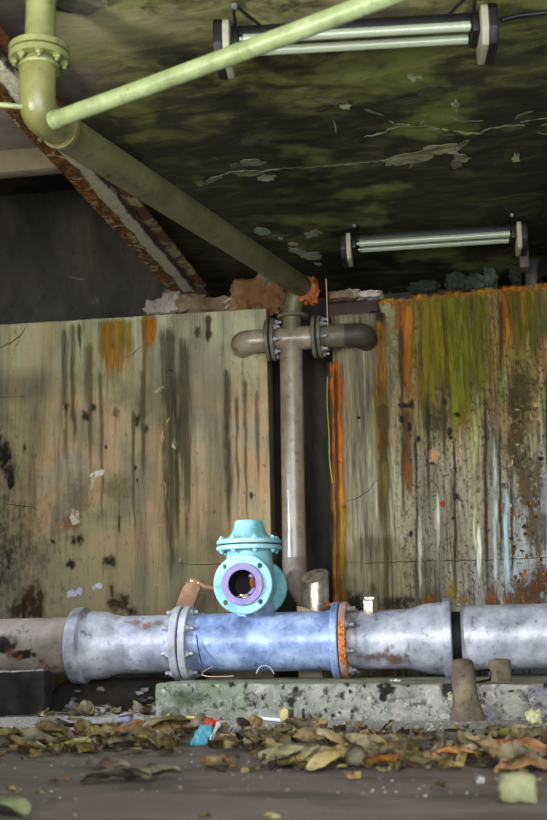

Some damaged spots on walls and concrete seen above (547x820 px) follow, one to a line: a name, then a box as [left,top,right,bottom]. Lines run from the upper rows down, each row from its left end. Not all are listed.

peeling [196,140,471,187]
spalling [142,272,287,316]
corrosion [101,320,130,373]
corrosion [143,316,156,346]
leakage [161,331,190,562]
corrosion [374,284,547,610]
corrosion [330,363,346,602]